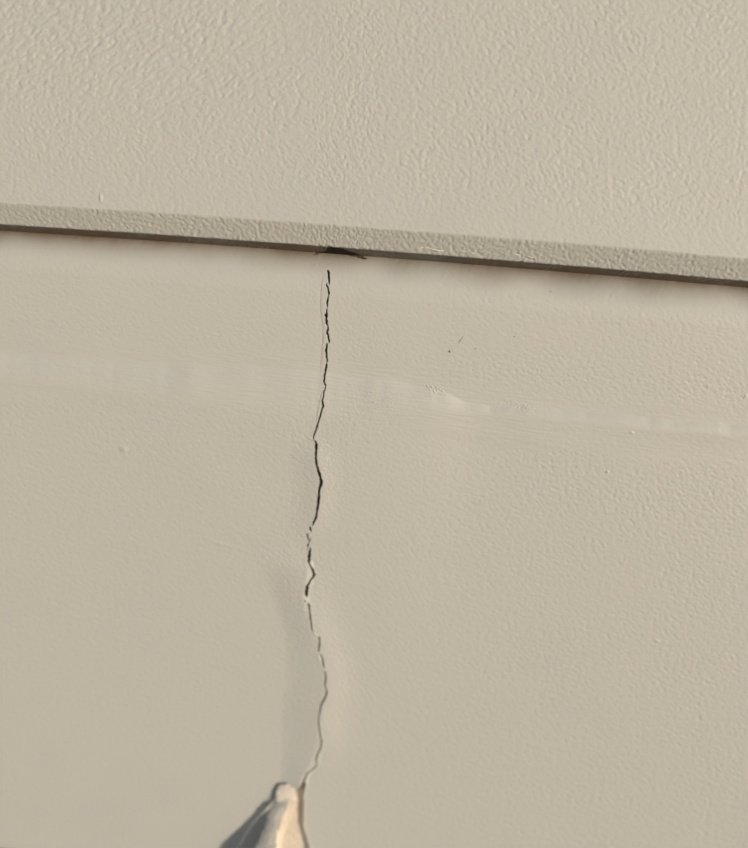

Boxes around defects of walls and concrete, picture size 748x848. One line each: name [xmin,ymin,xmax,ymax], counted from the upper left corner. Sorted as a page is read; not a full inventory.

crack [299,270,330,790]
peeling [255,780,311,848]